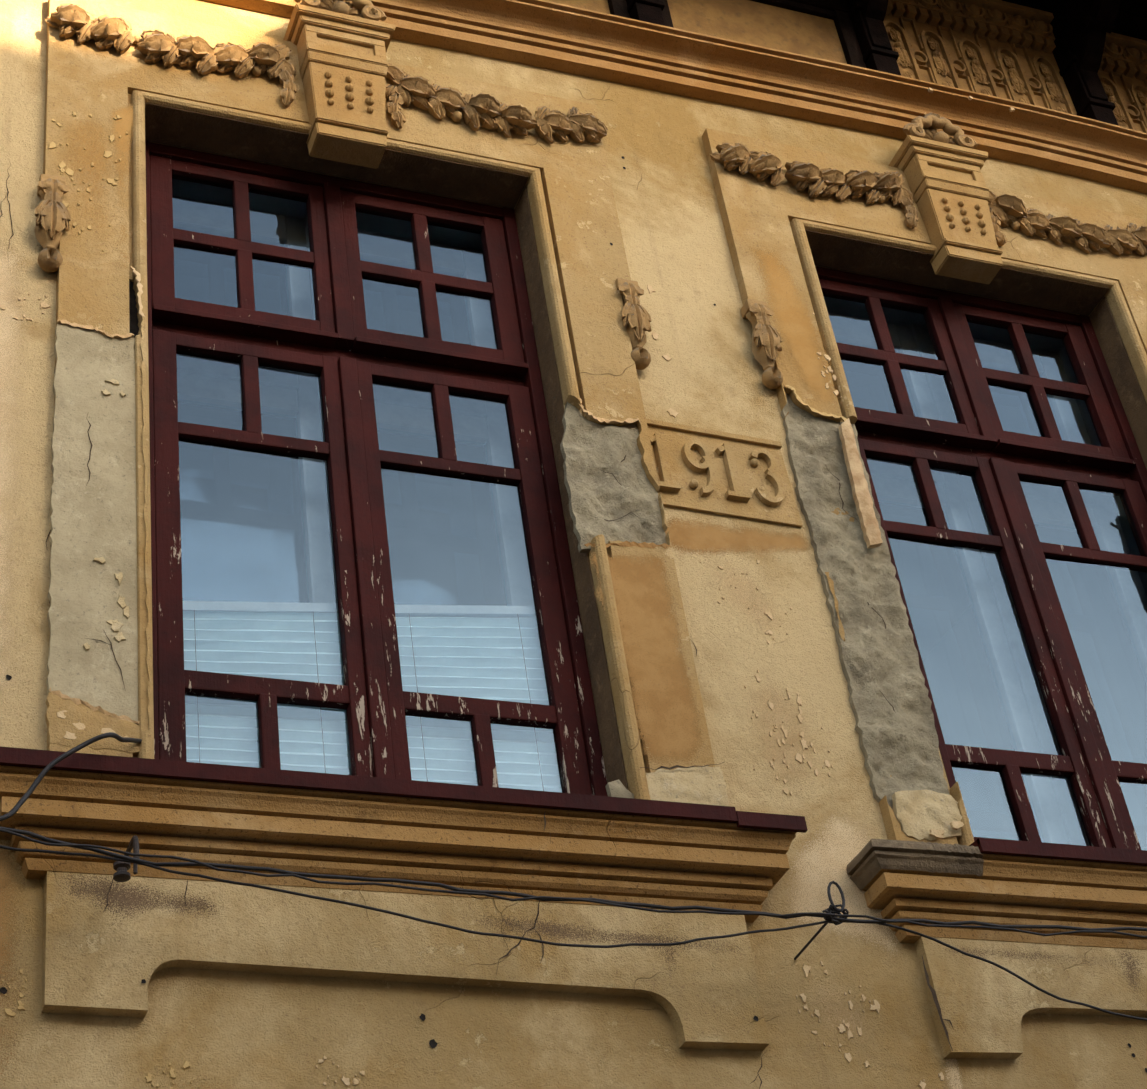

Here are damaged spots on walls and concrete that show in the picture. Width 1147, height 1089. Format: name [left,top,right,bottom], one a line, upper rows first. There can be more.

crack [0,168,14,248]
peeling [49,112,128,252]
spalling [45,266,145,757]
spalling [560,398,671,553]
spalling [781,310,969,841]
peeling [796,961,880,1068]